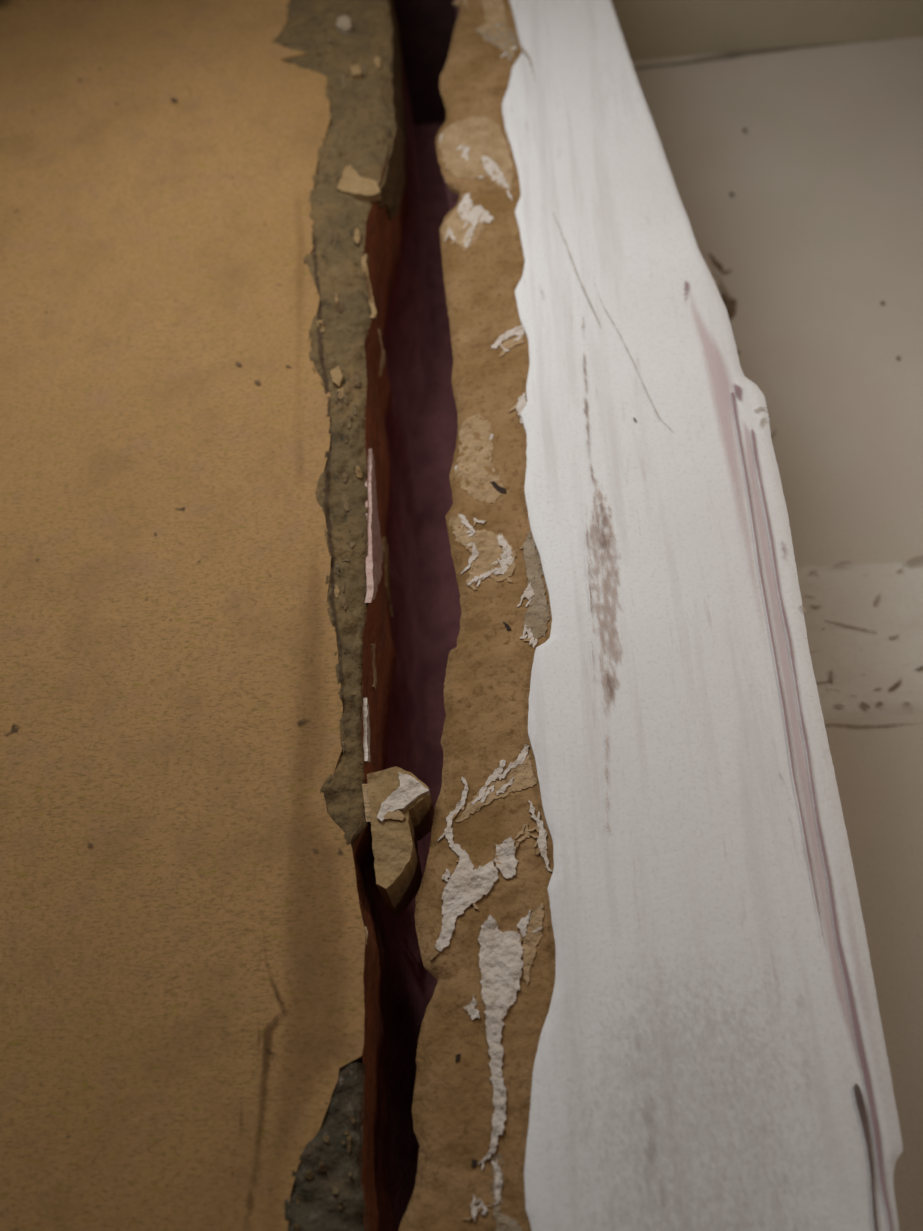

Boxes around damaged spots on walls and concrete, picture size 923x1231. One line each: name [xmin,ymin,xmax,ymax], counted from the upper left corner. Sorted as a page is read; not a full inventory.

spalling [272,0,409,849]
flaking render [399,0,556,1231]
spalling [709,253,737,320]
spalling [285,1062,369,1231]